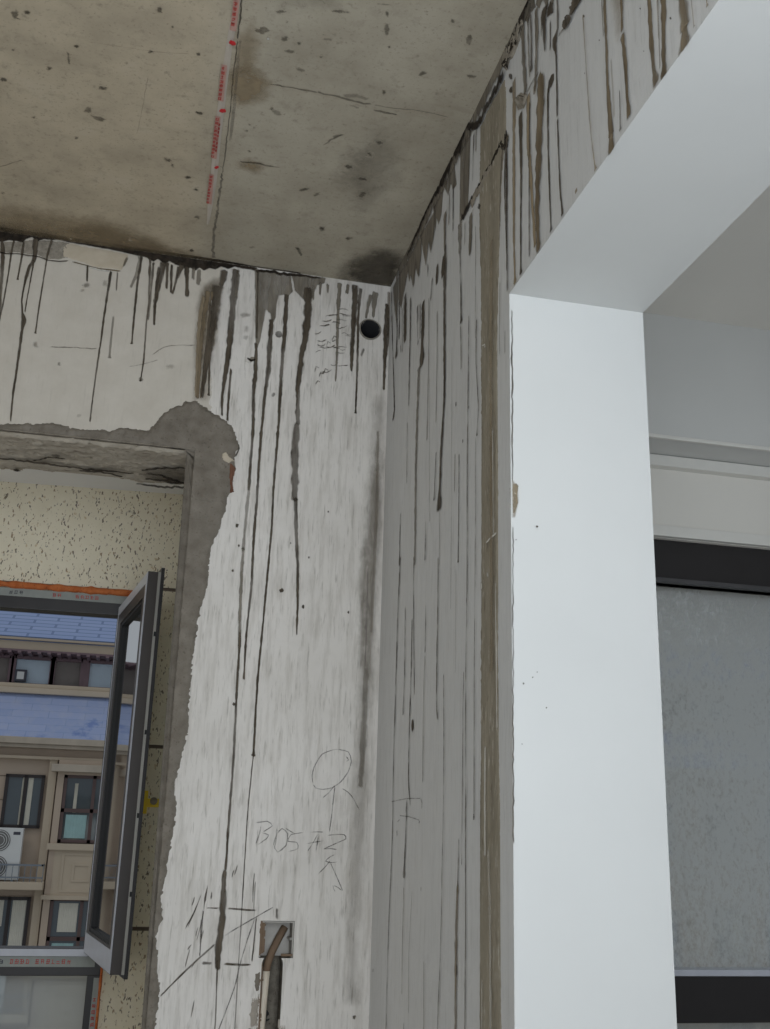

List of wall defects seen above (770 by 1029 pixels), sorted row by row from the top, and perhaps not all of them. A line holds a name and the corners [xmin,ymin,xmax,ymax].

crack [0,0,320,278]
leakage [499,0,563,340]
leakage [601,0,630,155]
leakage [647,0,667,88]
leakage [679,0,689,54]
leakage [0,215,240,421]
leakage [214,130,479,1029]